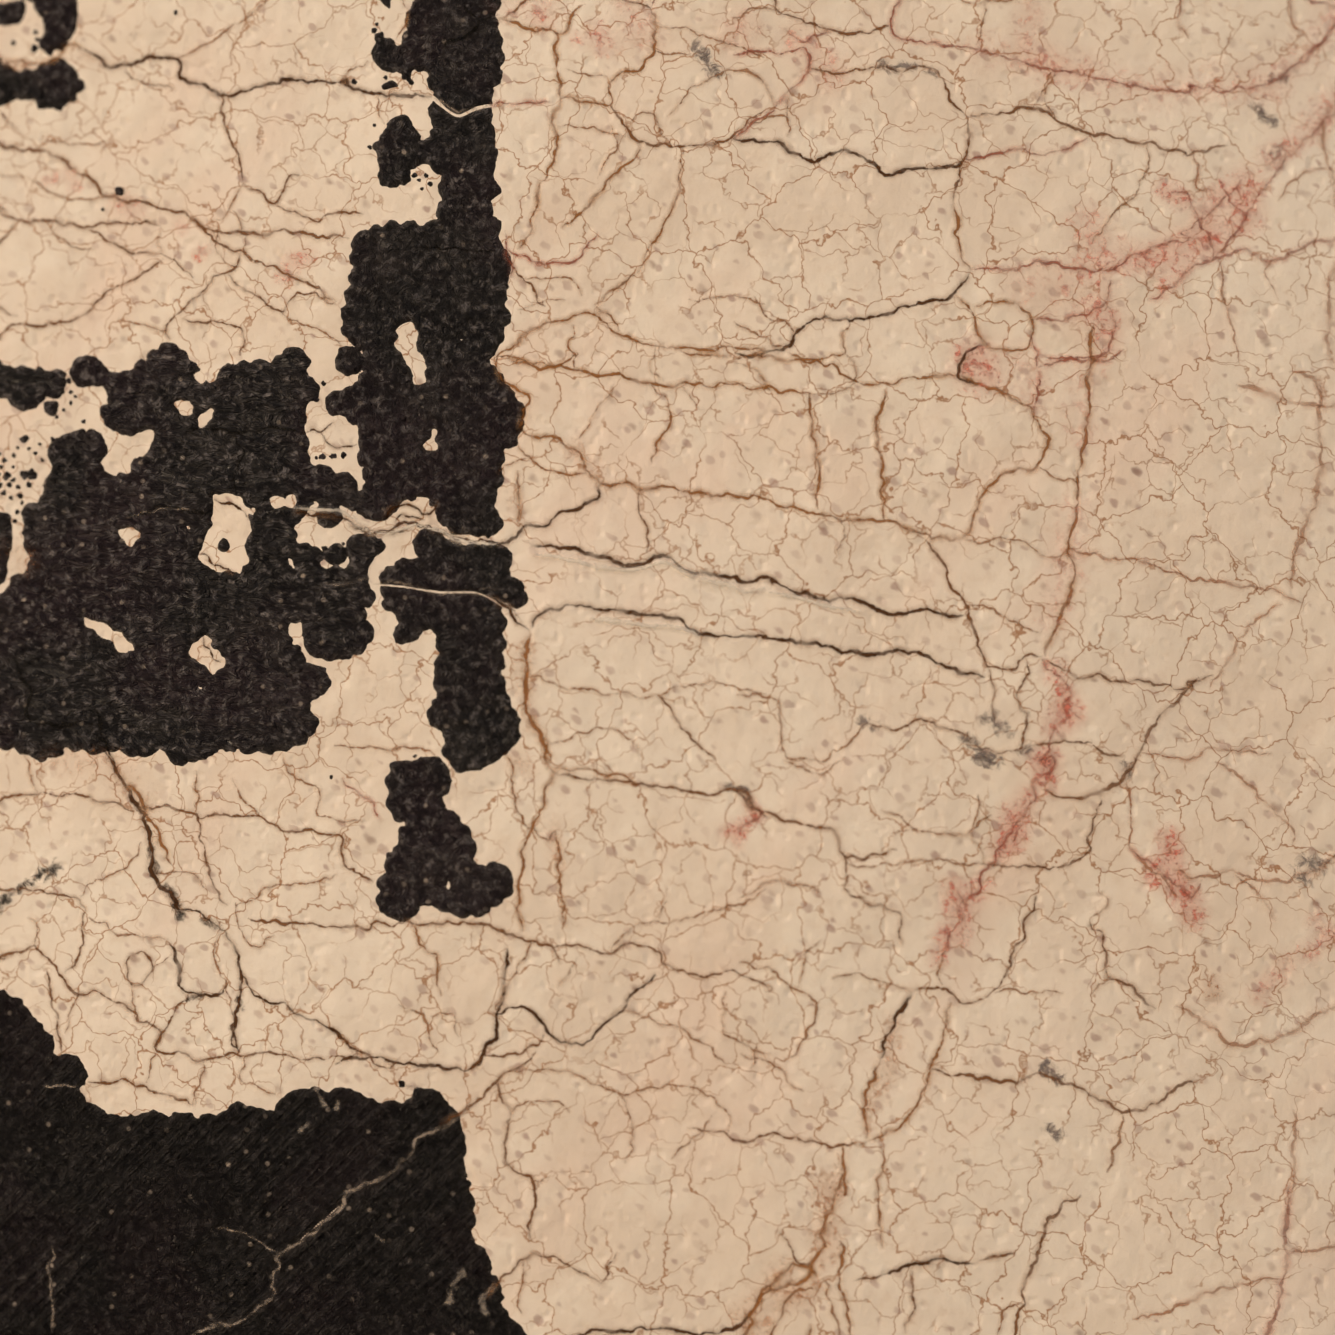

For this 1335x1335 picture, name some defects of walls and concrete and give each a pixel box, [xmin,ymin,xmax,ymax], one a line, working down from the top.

crack [0,0,425,353]
crack [202,553,233,573]
crack [129,423,352,517]
peeling [0,0,528,922]
crack [296,0,1289,939]
peeling [0,989,527,1335]
crack [0,662,1193,1335]
crack [1137,1278,1269,1319]
crack [1215,1029,1262,1048]